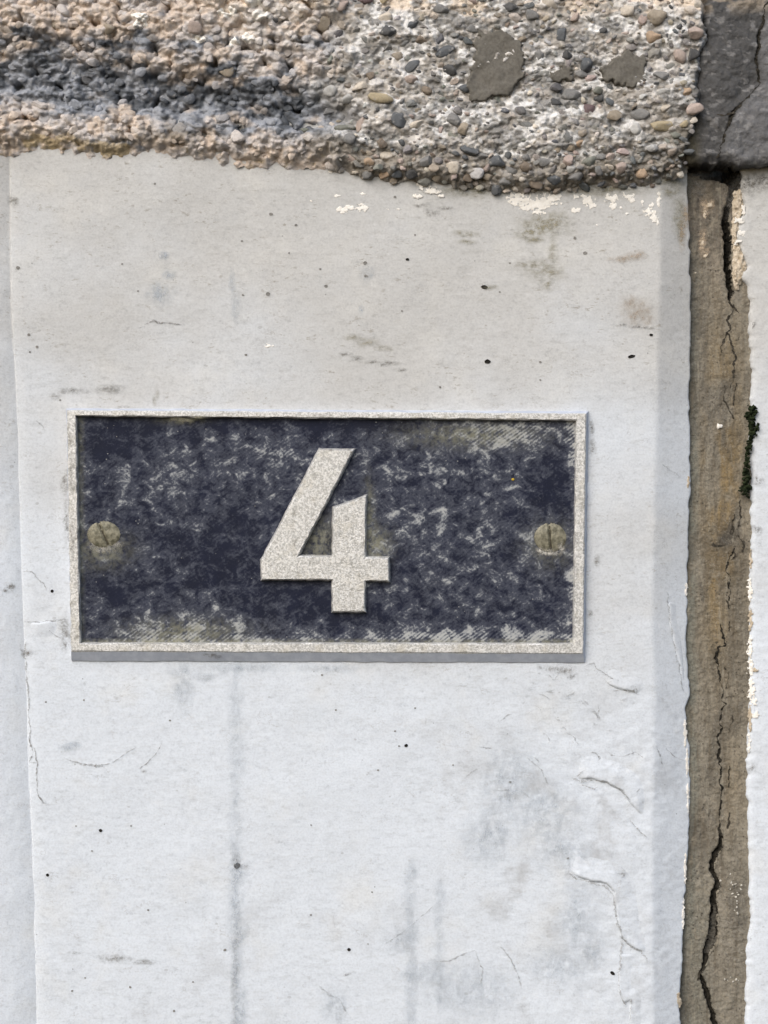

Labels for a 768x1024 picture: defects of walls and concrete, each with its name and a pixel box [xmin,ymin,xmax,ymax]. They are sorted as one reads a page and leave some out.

peeling [506,192,661,225]
spalling [731,189,747,290]
crack [716,2,768,419]
crack [697,500,745,1024]